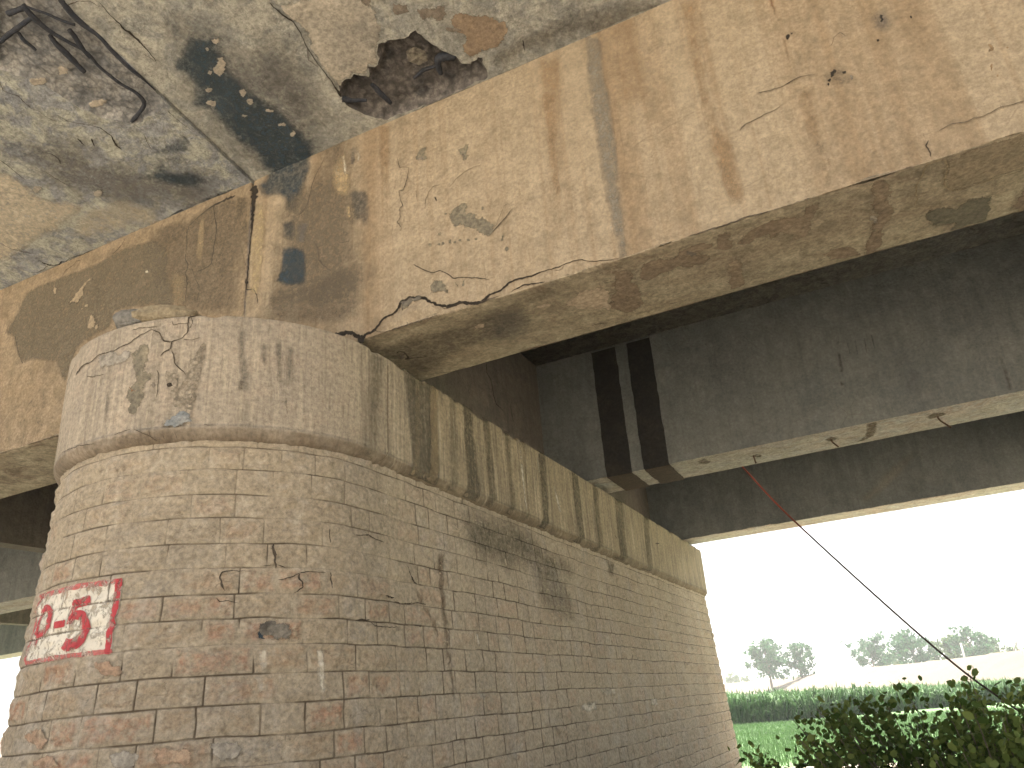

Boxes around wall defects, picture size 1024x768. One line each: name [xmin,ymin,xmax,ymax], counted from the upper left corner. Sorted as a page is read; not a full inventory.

spalling [281,0,508,120]
damp [177,34,358,319]
peeling [428,203,508,252]
damp [580,11,637,257]
crack [67,195,258,396]
crack [335,258,619,344]
spalling [257,620,292,640]
crack [217,544,333,603]